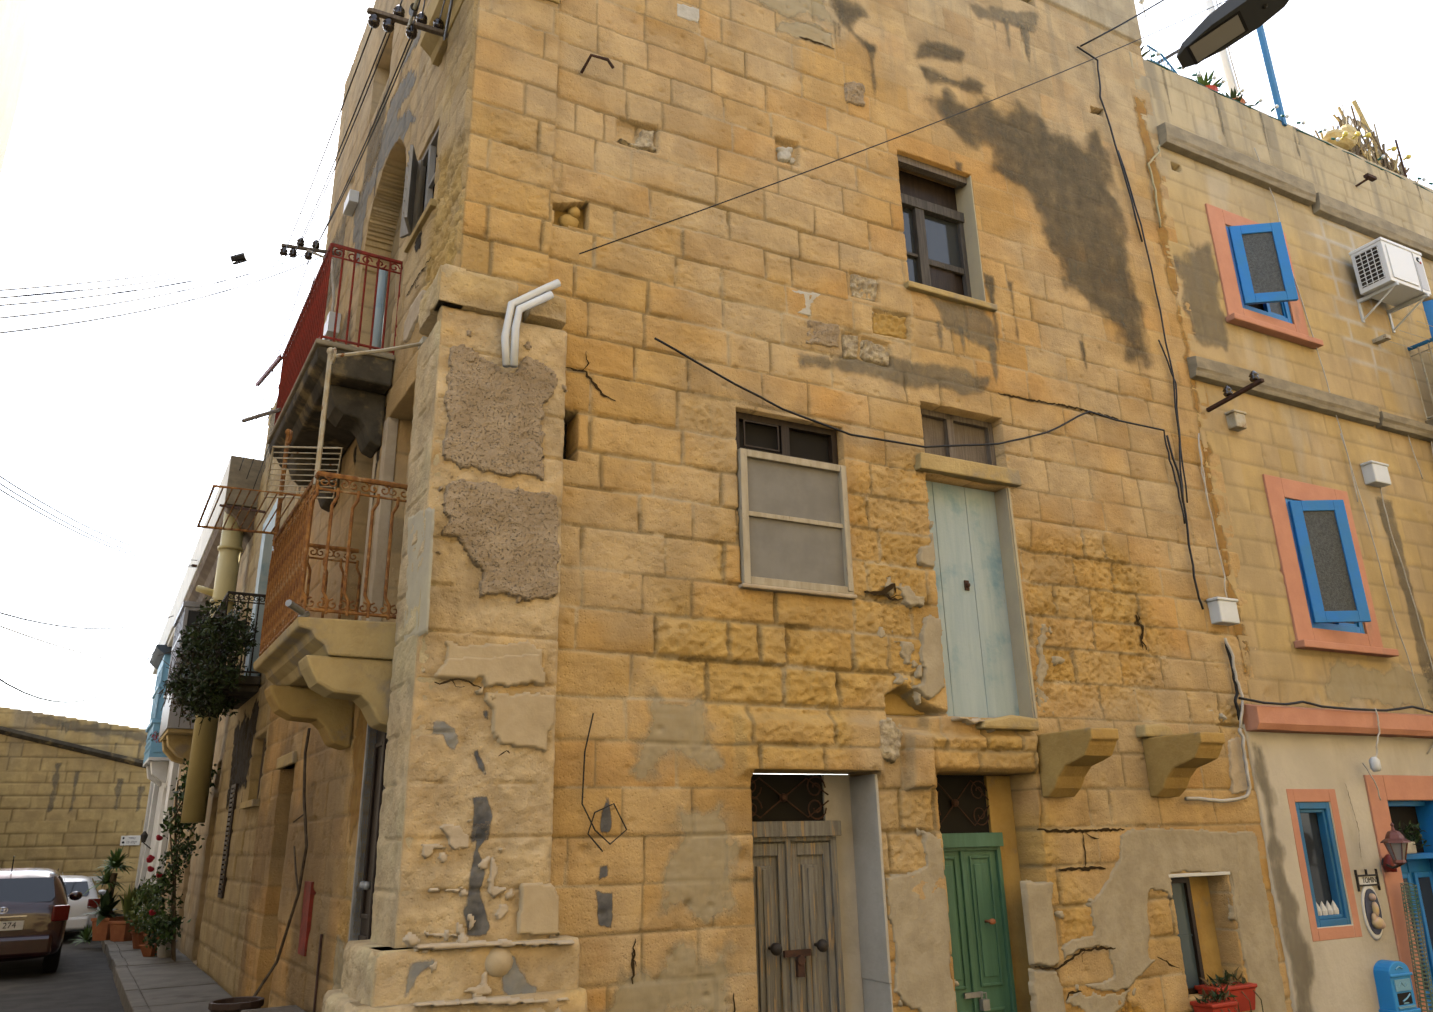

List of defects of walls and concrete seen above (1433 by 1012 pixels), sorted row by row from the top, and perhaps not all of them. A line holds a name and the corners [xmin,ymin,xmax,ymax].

flaking render [421,819,472,863]
flaking render [478,848,514,920]
flaking render [403,914,476,973]